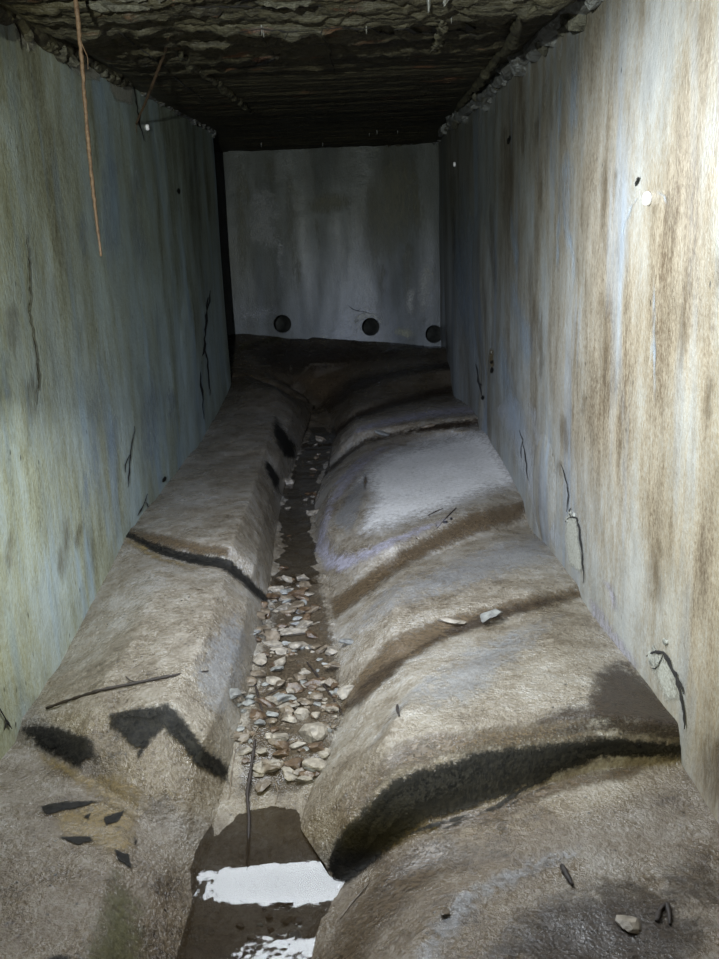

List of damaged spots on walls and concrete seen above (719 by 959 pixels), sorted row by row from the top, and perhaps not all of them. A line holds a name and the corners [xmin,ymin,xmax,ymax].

spalling [85,0,163,12]
spalling [256,0,311,10]
spalling [0,4,217,138]
spalling [432,0,604,145]
crack [26,235,40,410]
crack [200,290,211,414]
crack [125,426,149,516]
damp [500,400,538,500]
crack [519,430,529,481]
crack [561,465,584,582]
damp [356,604,681,852]
crack [647,650,685,729]